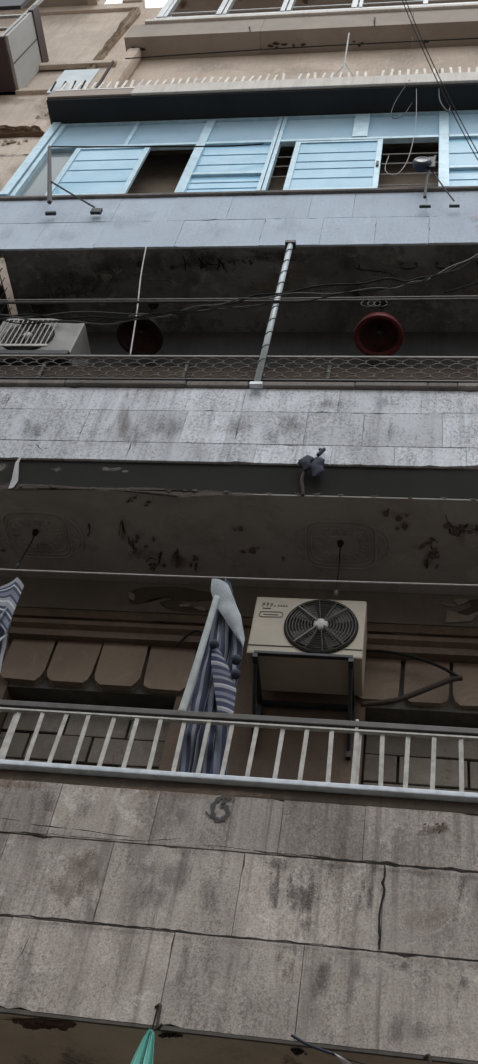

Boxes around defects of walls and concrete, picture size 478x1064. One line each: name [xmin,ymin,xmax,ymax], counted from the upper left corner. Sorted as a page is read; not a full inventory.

crack [1,818,171,841]
crack [0,845,478,963]
damp [265,857,314,926]
spalling [12,1019,77,1031]